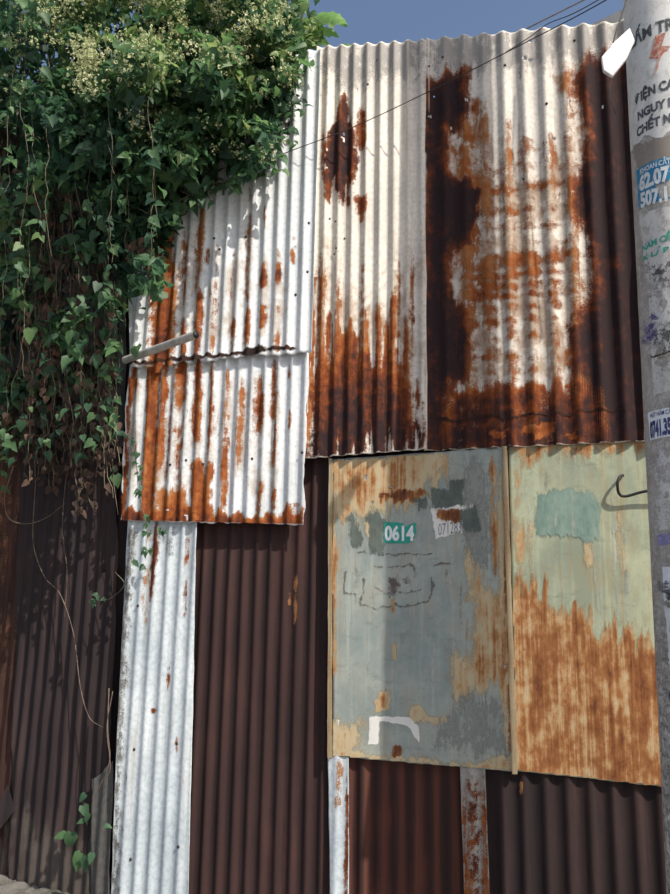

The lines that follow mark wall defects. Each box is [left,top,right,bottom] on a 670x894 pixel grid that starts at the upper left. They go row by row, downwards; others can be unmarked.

corrosion [121,208,305,625]
peeling [333,453,454,539]
corrosion [305,42,662,894]